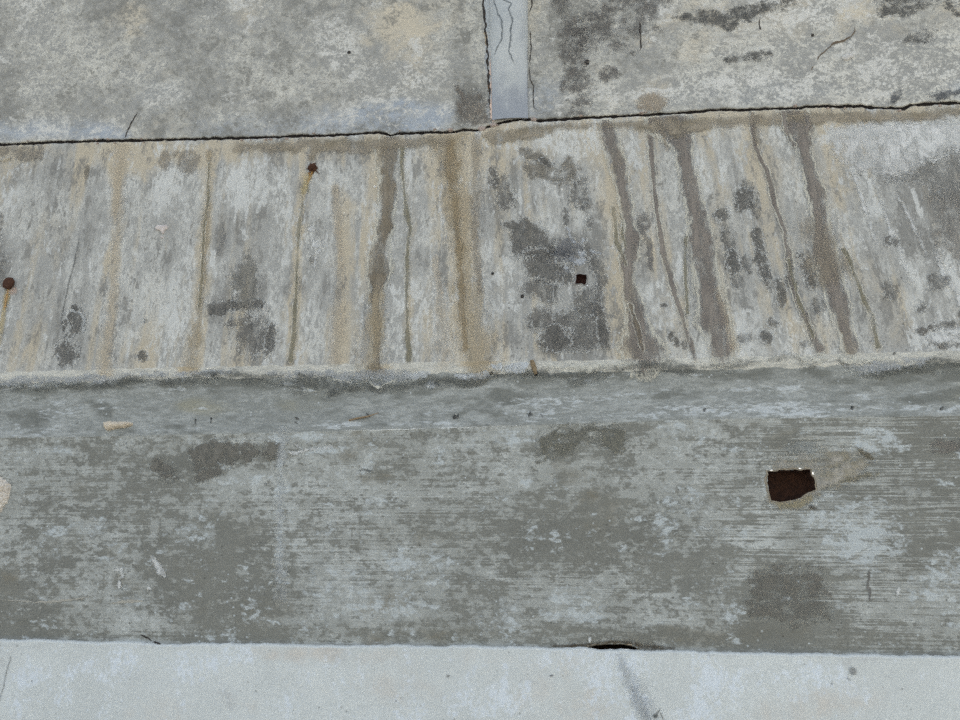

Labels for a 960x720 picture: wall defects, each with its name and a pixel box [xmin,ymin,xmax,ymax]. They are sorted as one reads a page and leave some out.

crack [0,0,960,146]
leakage [179,151,211,310]
corrosion [287,263,299,364]
corrosion [296,171,313,245]
leakage [233,133,529,389]
leakage [454,0,960,381]
spalling [766,442,879,509]